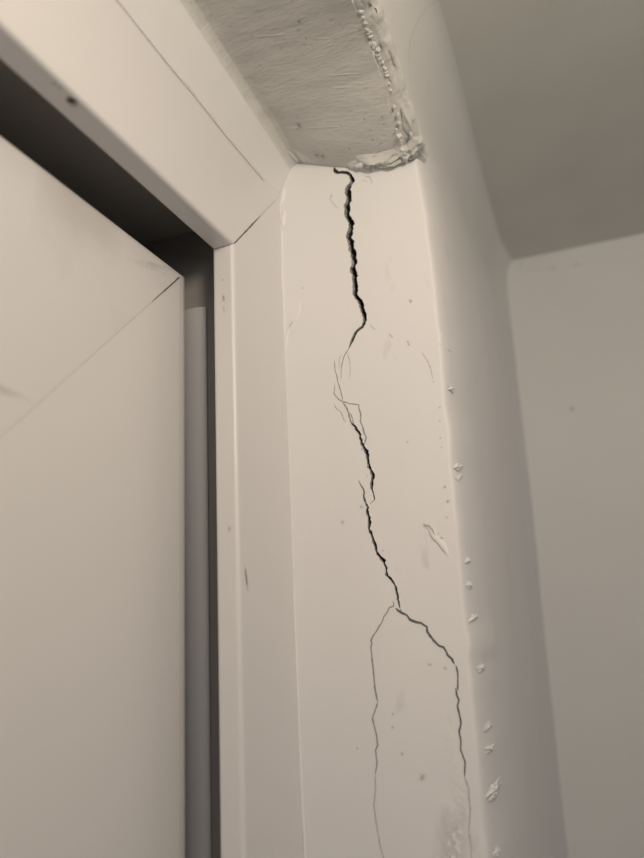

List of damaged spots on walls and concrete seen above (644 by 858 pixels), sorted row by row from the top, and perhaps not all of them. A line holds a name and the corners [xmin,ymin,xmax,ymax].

crack [333,167,472,858]